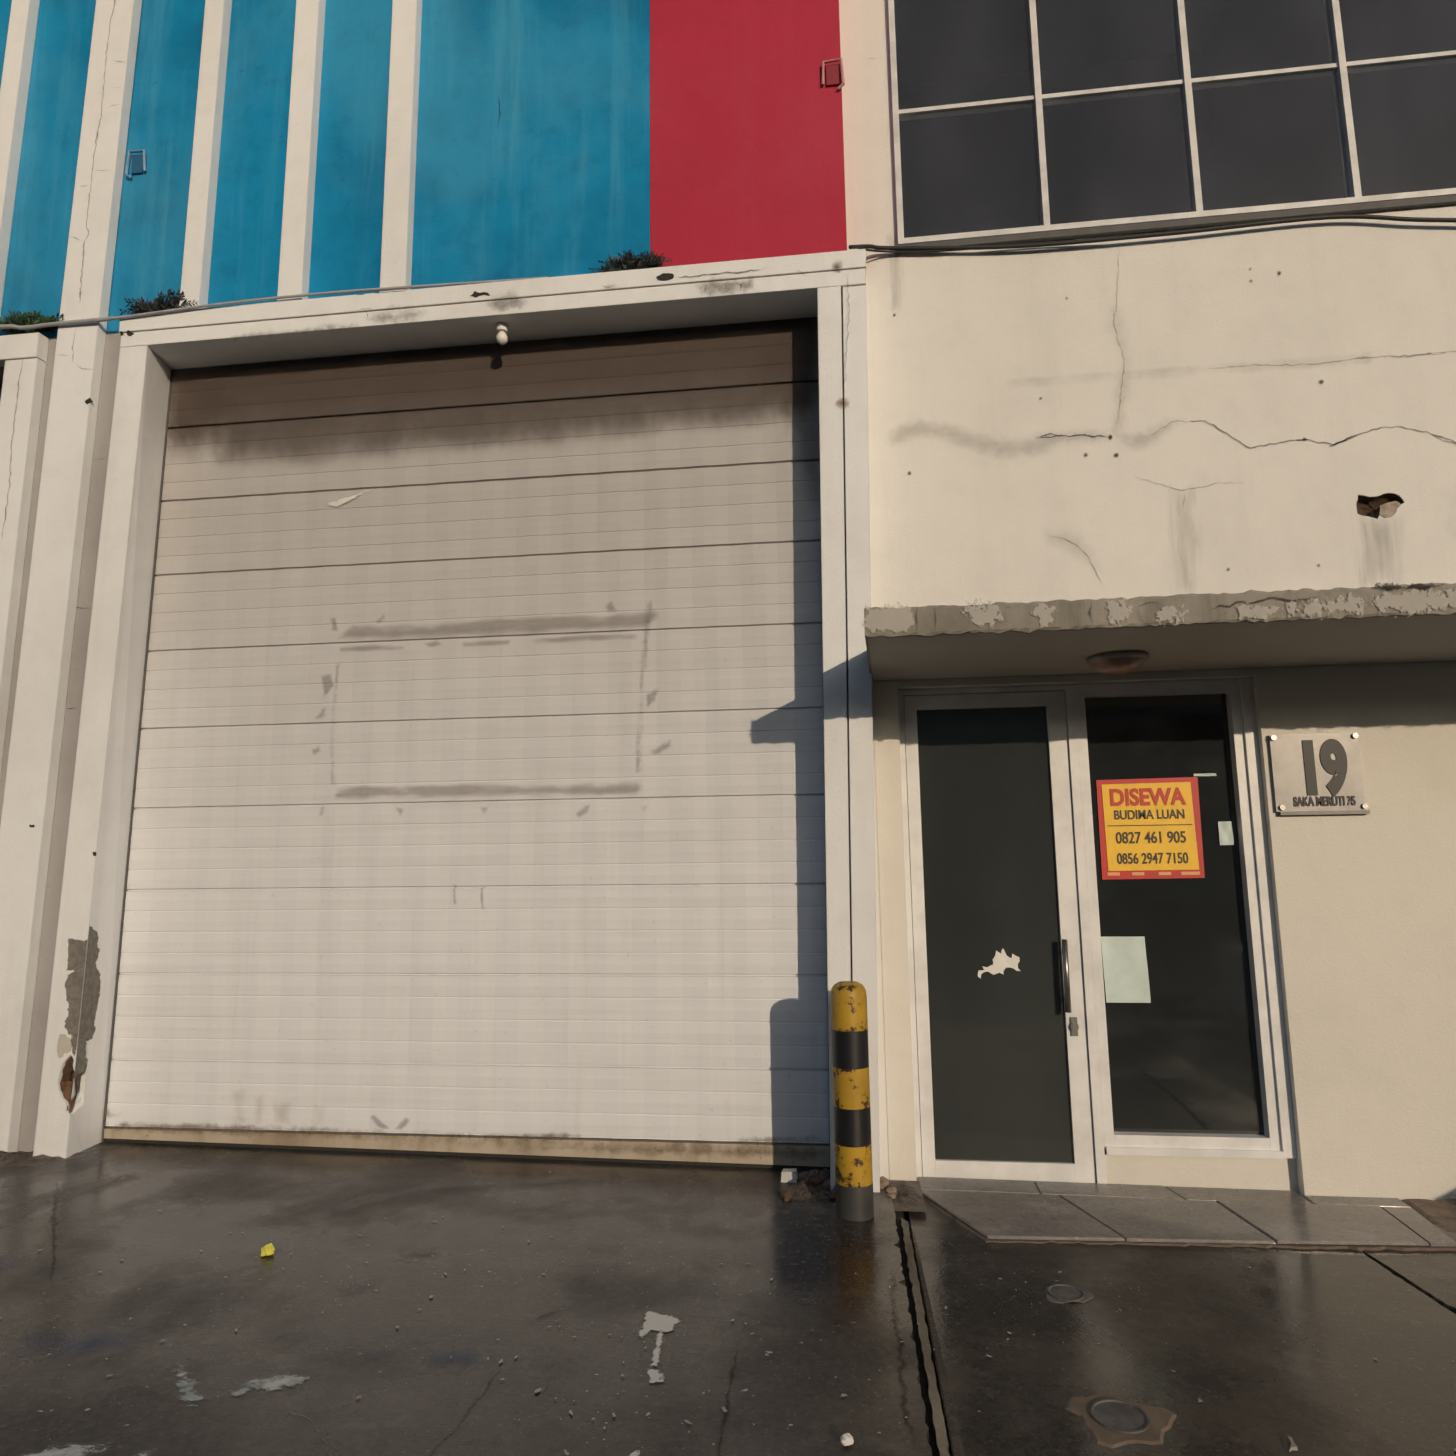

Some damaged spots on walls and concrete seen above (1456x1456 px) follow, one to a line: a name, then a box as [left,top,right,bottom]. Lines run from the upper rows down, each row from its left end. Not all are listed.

crack [1040,431,1105,439]
crack [1169,420,1456,448]
spalling [1356,493,1404,519]
peeling [962,599,1004,628]
peeling [1031,603,1056,628]
peeling [1099,598,1134,627]
peeling [1156,605,1188,627]
peeling [1235,587,1456,620]
peeling [57,926,101,1113]